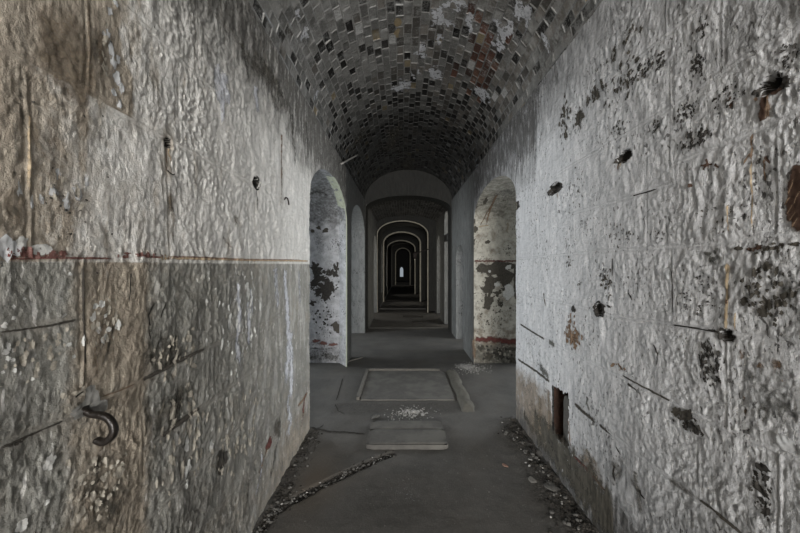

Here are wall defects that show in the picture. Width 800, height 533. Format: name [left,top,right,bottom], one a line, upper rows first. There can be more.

peeling [558,19,666,150]
peeling [690,53,706,78]
spalling [708,43,800,114]
peeling [674,100,712,152]
peeling [309,261,339,346]
peeling [475,261,516,325]
corrosion [564,313,583,350]
peeling [698,328,736,389]
spalling [671,407,704,437]
leakage [524,390,620,533]